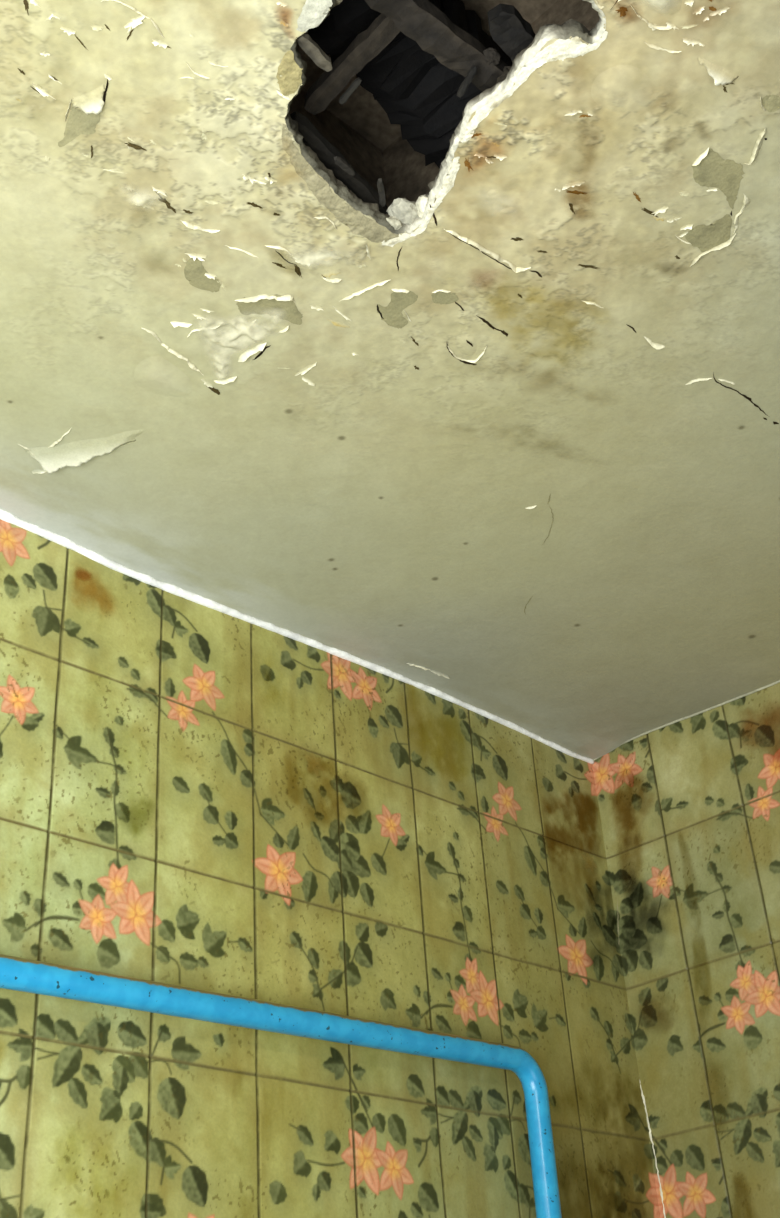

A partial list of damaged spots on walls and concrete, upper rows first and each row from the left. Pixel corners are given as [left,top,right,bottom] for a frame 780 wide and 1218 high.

flaking render [275,0,739,268]
peeling [243,173,278,184]
peeling [633,128,767,267]
peeling [226,245,342,283]
crack [581,300,665,349]
crack [685,374,779,424]
peeling [18,427,146,474]